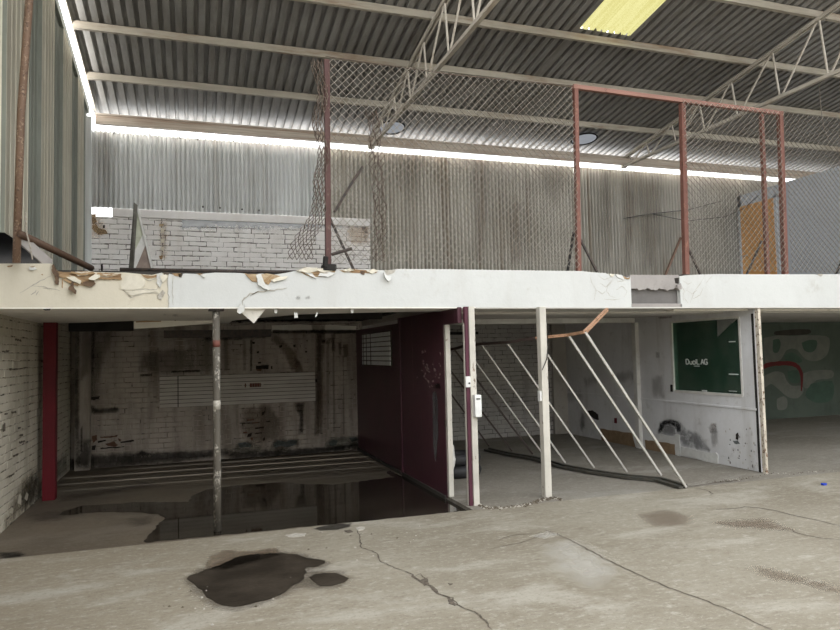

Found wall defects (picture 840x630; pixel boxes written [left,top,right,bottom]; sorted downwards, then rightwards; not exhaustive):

flaking render [29,264,183,300]
flaking render [244,273,288,290]
leakage [57,332,358,475]
leakage [658,420,703,448]
leakage [12,475,42,517]
crack [357,530,491,629]
crack [491,530,772,630]